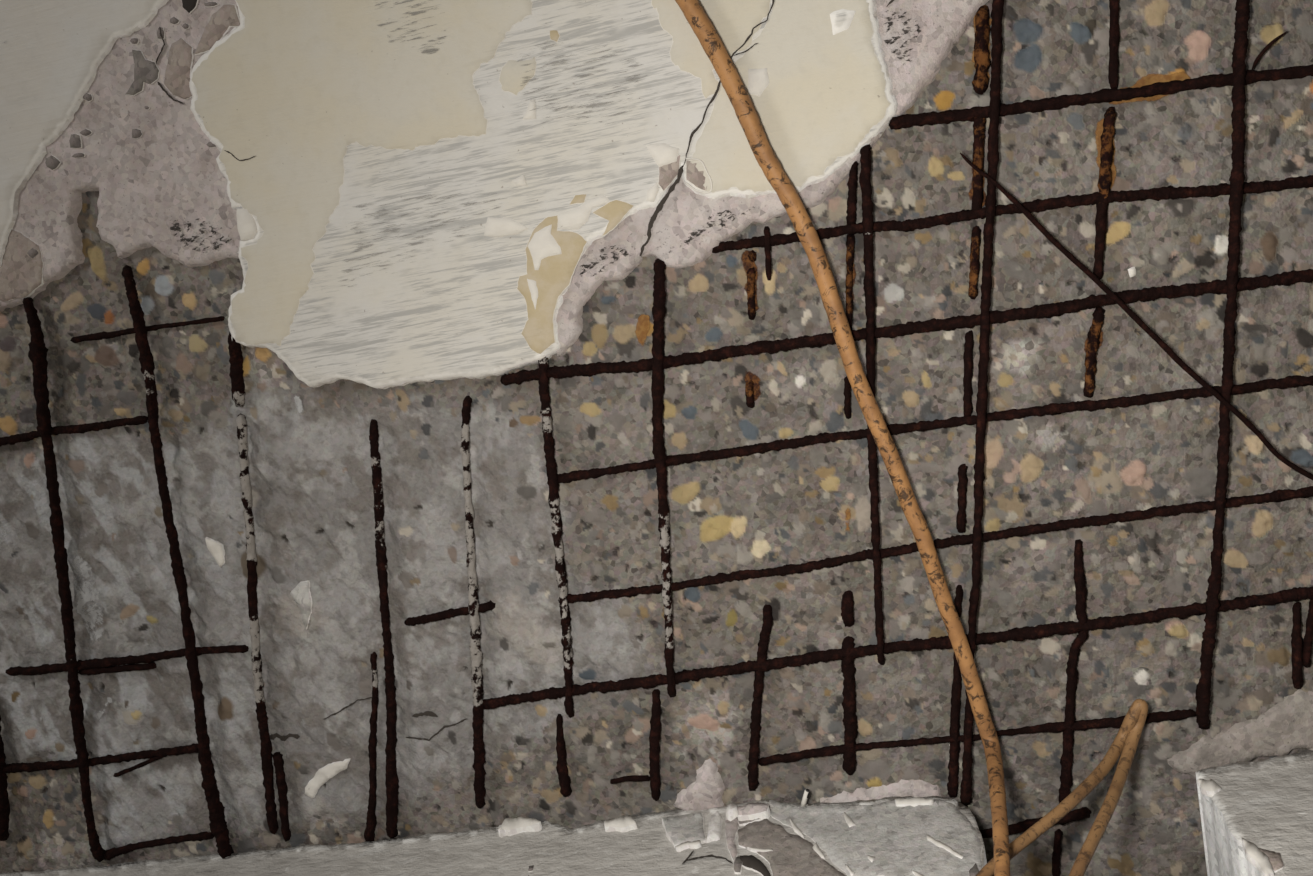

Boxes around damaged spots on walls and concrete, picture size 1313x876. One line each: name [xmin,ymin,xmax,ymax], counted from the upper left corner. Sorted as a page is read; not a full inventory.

corrosion [1109,72,1190,104]
crack [640,0,775,256]
corrosion [1095,119,1116,189]
corrosion [635,314,650,345]
corrosion [744,372,761,401]
spalling [0,0,994,876]
spalling [798,0,1313,876]